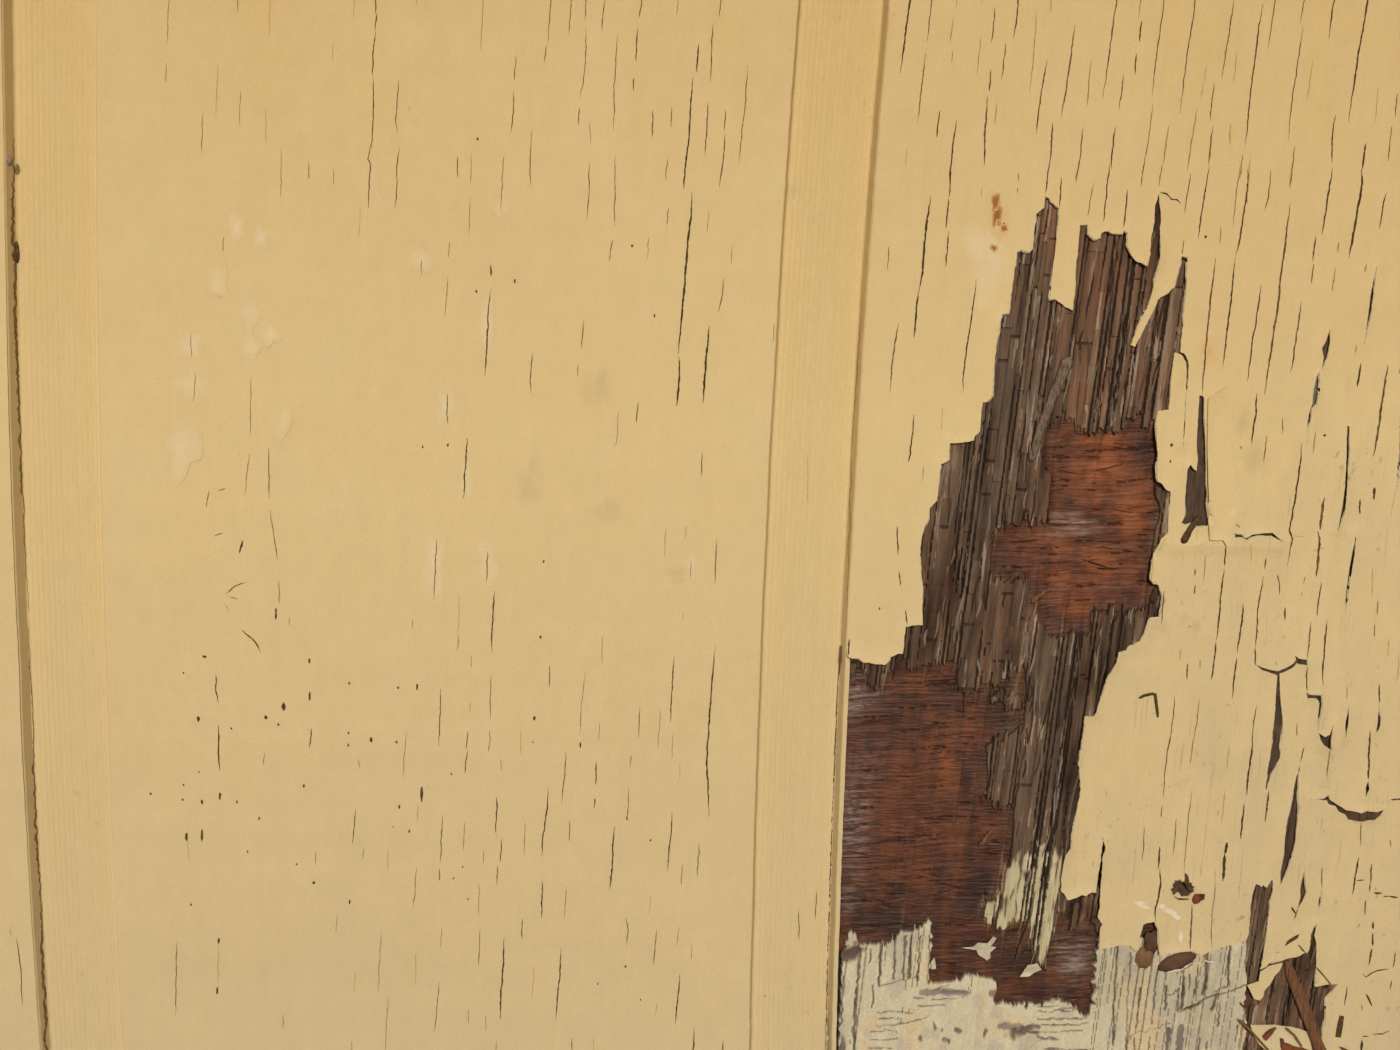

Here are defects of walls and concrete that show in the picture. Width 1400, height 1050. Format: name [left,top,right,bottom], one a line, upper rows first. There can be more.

crack [201,66,334,196]
crack [353,0,400,237]
crack [421,0,748,405]
rust [989,192,1008,253]
crack [213,677,221,770]
crack [206,383,290,651]
crack [446,395,468,498]
crack [352,539,723,1050]
crack [664,527,717,578]
crack [846,302,862,655]
peeling [826,197,1337,1050]
crack [890,0,1400,1050]